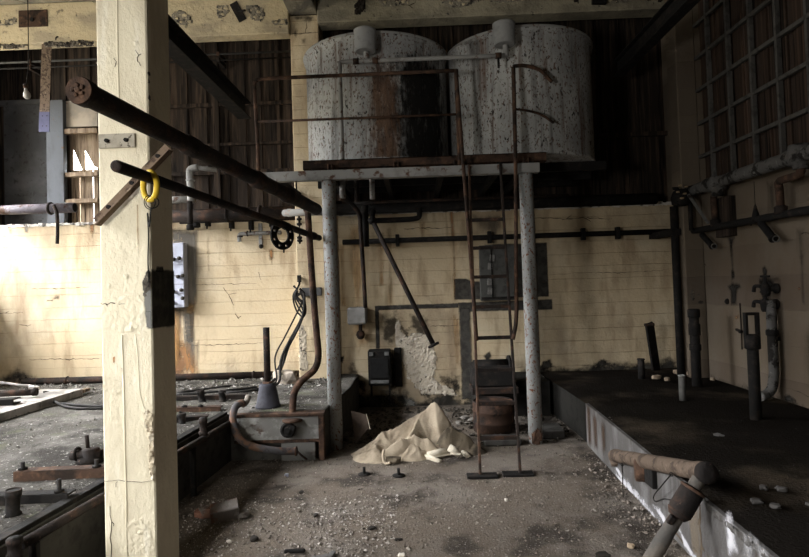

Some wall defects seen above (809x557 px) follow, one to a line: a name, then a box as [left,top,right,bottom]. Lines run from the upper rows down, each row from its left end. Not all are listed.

spalling [43,36,94,48]
rust [175,315,198,374]
spalling [395,320,458,396]
peeling [127,519,154,557]